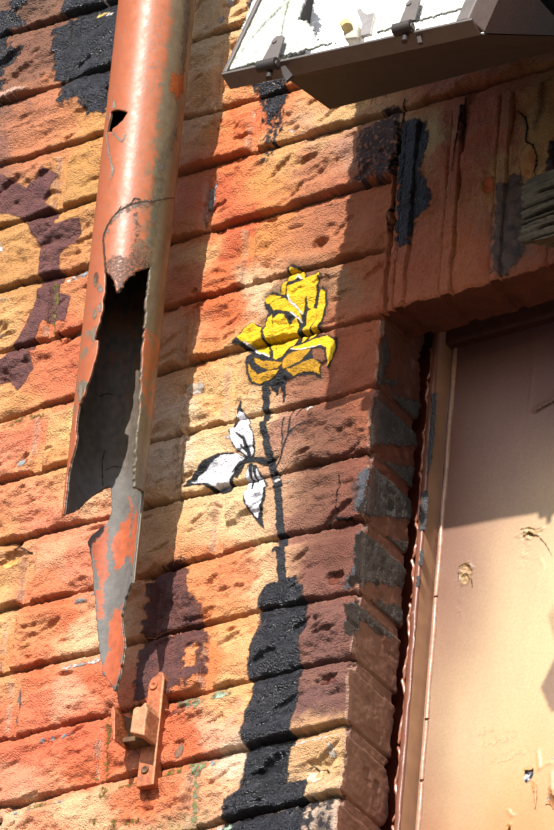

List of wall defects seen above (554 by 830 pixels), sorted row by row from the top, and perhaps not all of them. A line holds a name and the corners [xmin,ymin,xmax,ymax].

peeling [524,767,554,809]